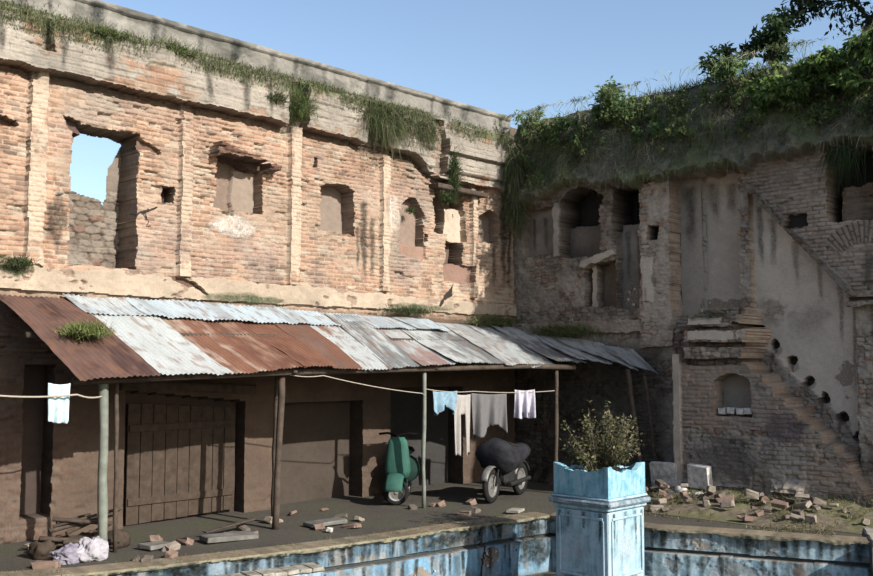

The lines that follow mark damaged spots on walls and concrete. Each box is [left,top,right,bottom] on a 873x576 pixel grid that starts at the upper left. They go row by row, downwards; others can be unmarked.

leakage [357,203,374,268]
leakage [225,517,552,576]
spalling [409,566,437,576]